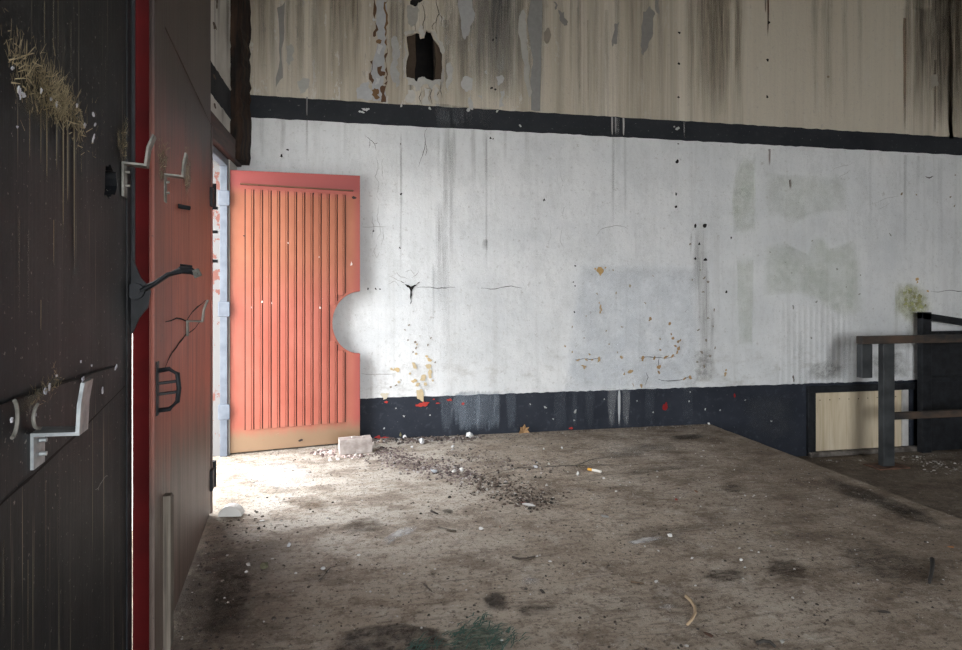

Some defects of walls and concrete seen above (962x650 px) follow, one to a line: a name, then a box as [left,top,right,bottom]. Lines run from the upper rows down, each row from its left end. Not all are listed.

peeling [356,0,388,113]
flaking render [400,0,482,112]
peeling [518,0,551,111]
peeling [640,0,660,55]
crack [389,270,449,304]